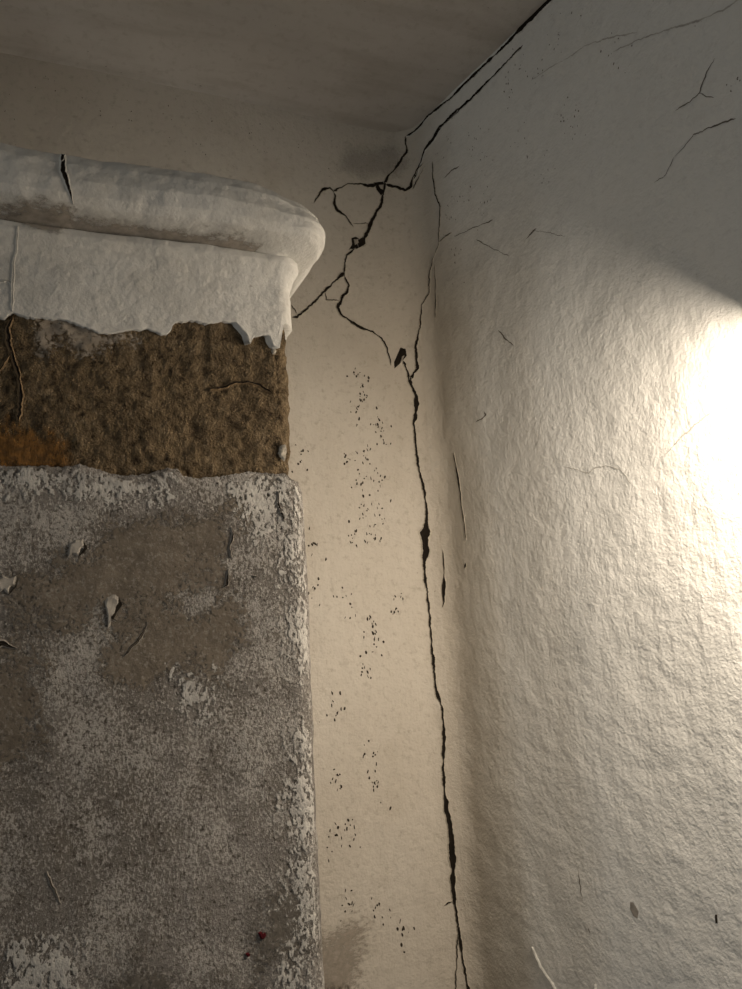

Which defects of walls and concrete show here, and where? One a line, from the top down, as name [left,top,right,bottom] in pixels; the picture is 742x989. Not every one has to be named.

crack [533,0,738,79]
crack [675,58,715,111]
crack [59,154,74,206]
crack [654,118,736,183]
rust [0,415,71,467]
flaking render [0,315,320,739]
flaking render [344,367,392,547]
crack [291,0,556,989]
flaking render [333,587,385,679]
flaking render [231,700,361,989]
peeling [0,917,181,989]
damp [322,923,368,989]